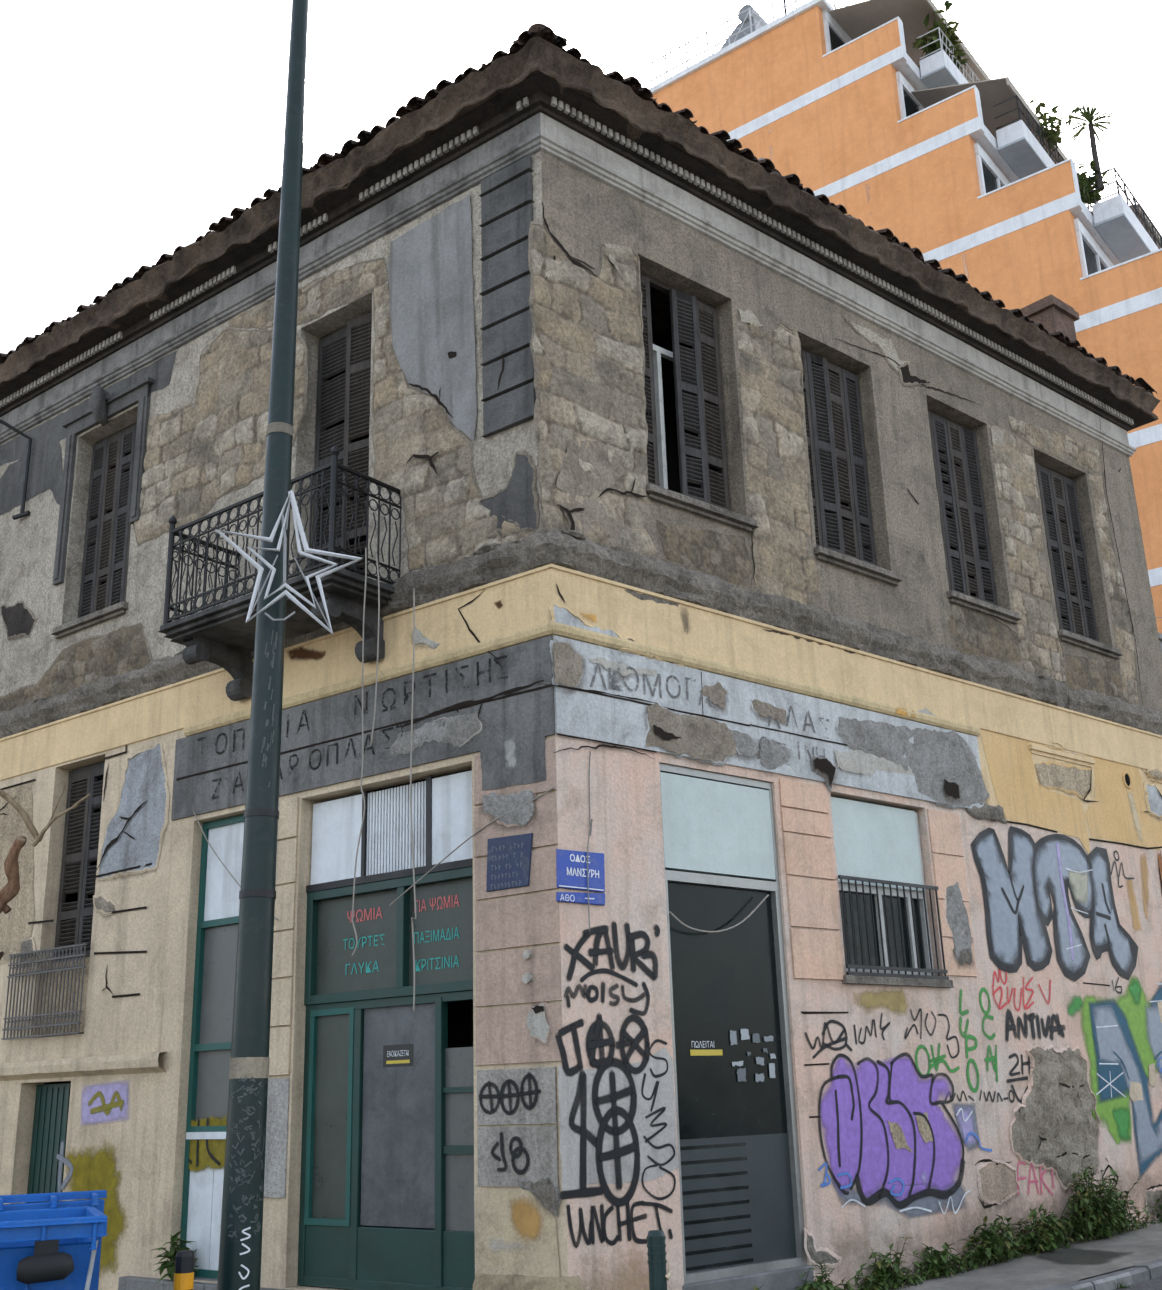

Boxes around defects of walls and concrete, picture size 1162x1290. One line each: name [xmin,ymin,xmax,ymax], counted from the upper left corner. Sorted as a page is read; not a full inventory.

crack [542,202,598,280]
crack [408,383,452,417]
crack [835,338,983,406]
crack [400,589,656,727]
spalling [549,602,699,687]
spalling [388,711,482,757]
spalling [644,681,792,770]
spalling [833,708,1007,824]
peeling [1035,740,1092,799]
peeling [93,741,170,916]
spalling [943,882,973,966]
spalling [976,1159,1021,1205]